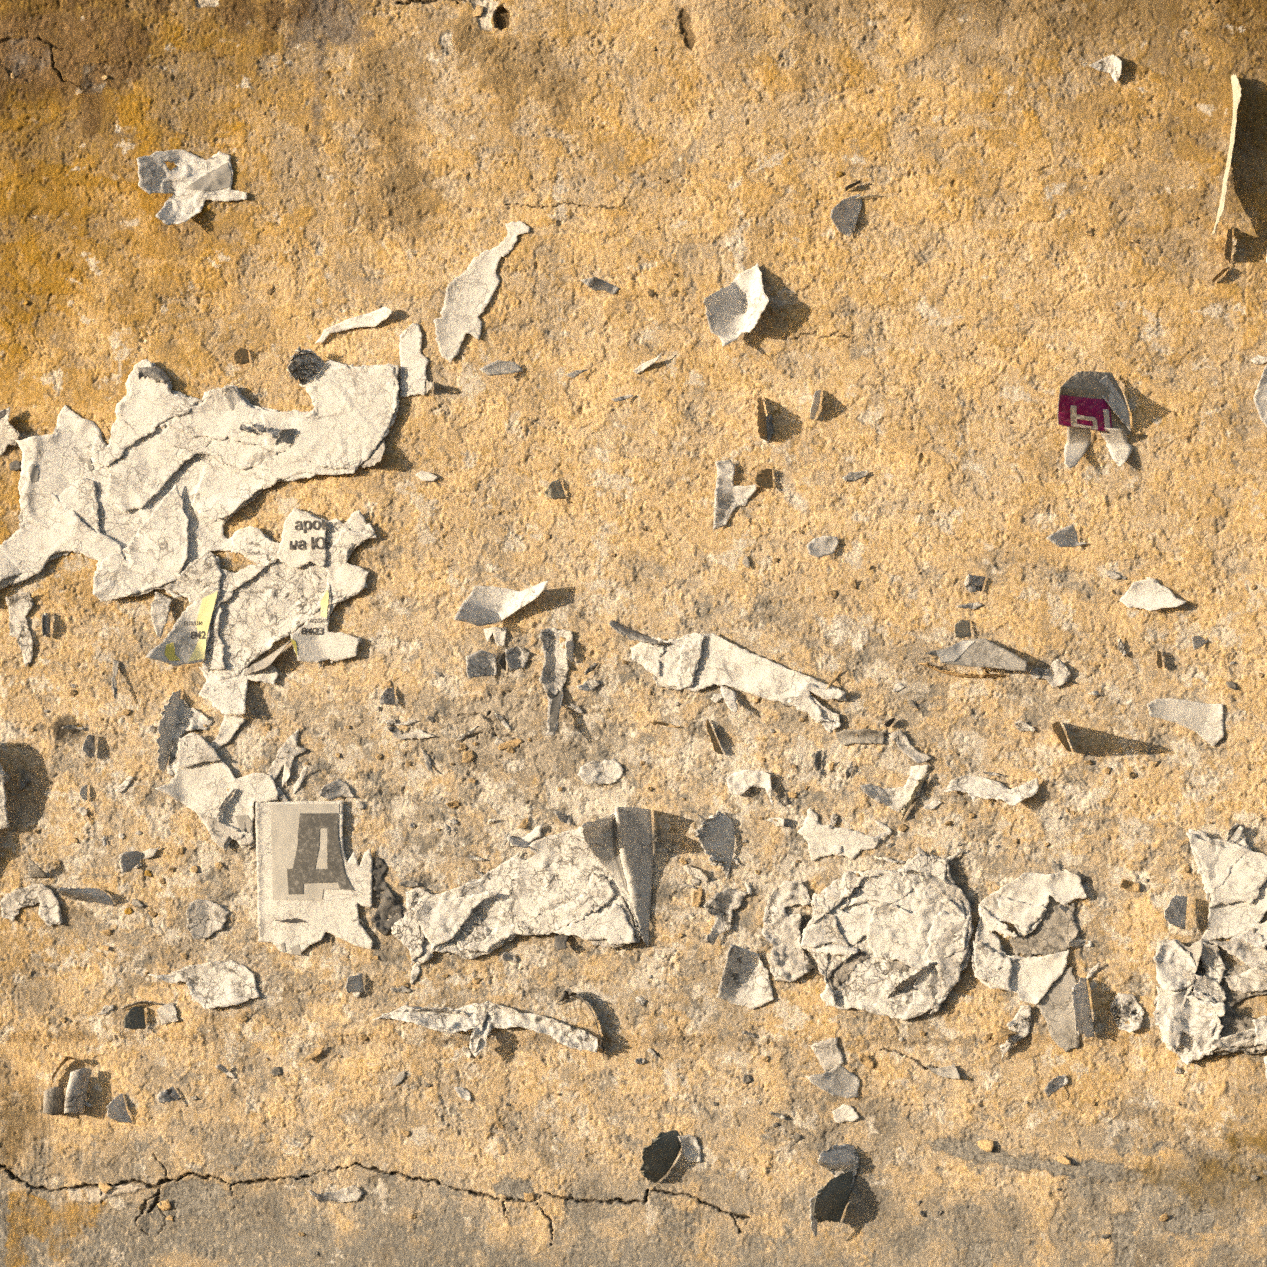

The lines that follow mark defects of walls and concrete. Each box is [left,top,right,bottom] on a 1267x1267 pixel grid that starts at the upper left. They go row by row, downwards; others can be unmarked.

peeling [233,348,250,364]
crack [0,1162,750,1246]